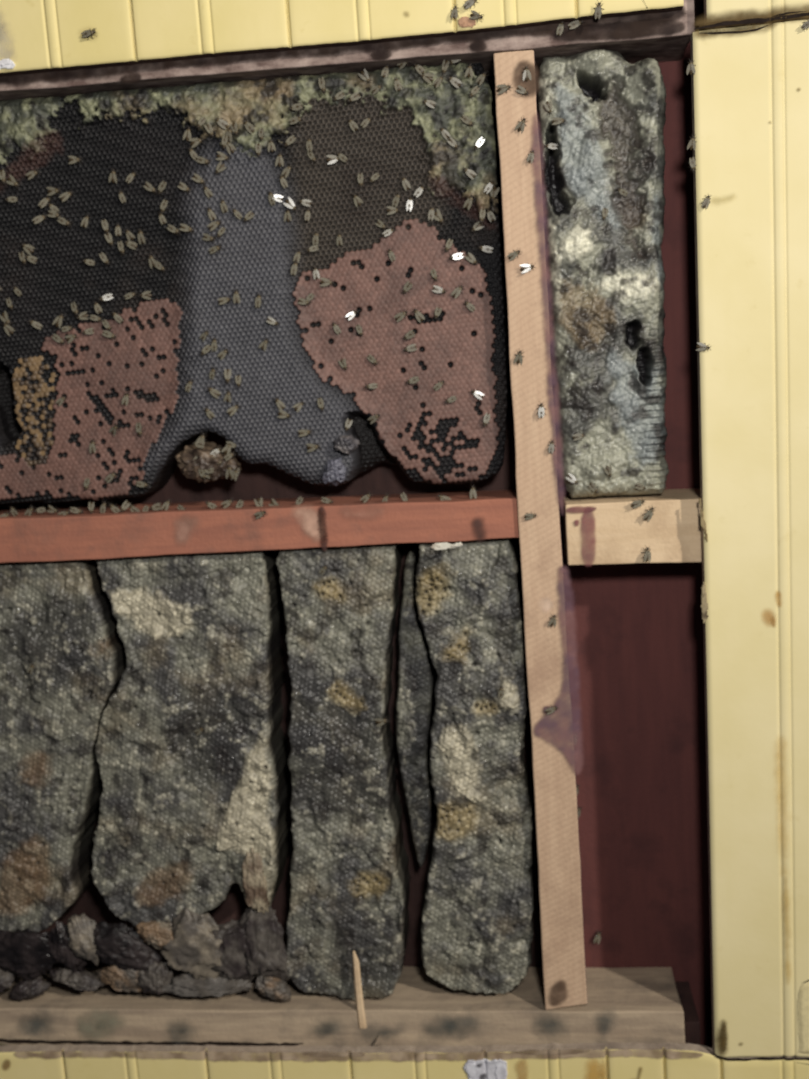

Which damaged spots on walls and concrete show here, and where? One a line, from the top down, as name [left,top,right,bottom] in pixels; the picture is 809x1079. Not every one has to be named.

spalling [14,1048,703,1079]